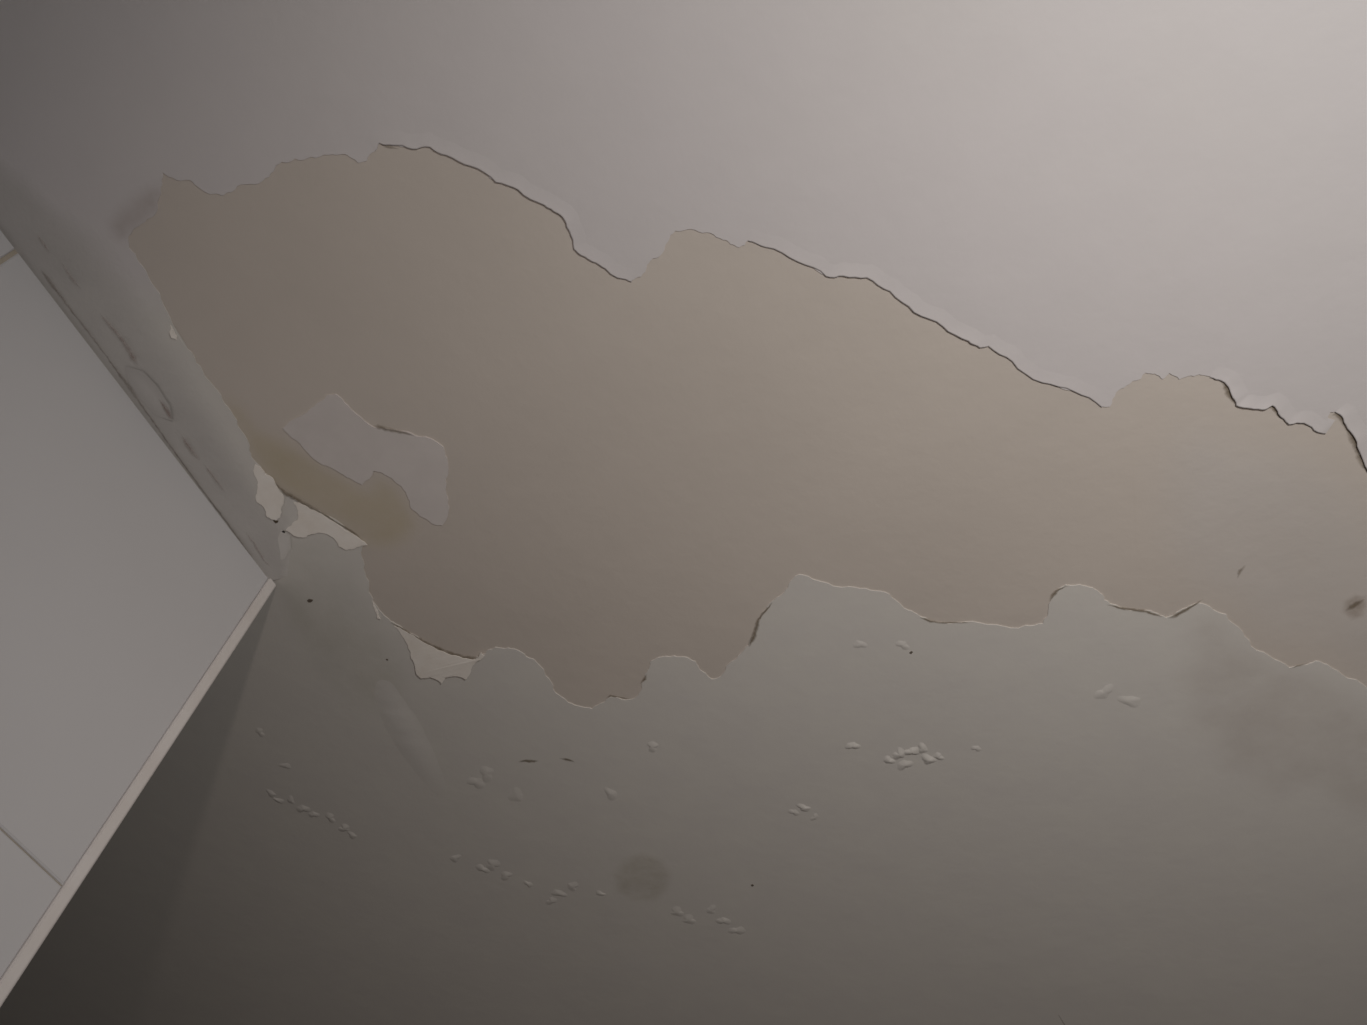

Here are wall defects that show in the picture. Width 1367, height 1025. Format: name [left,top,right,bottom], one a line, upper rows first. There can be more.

peeling [129,130,1367,709]